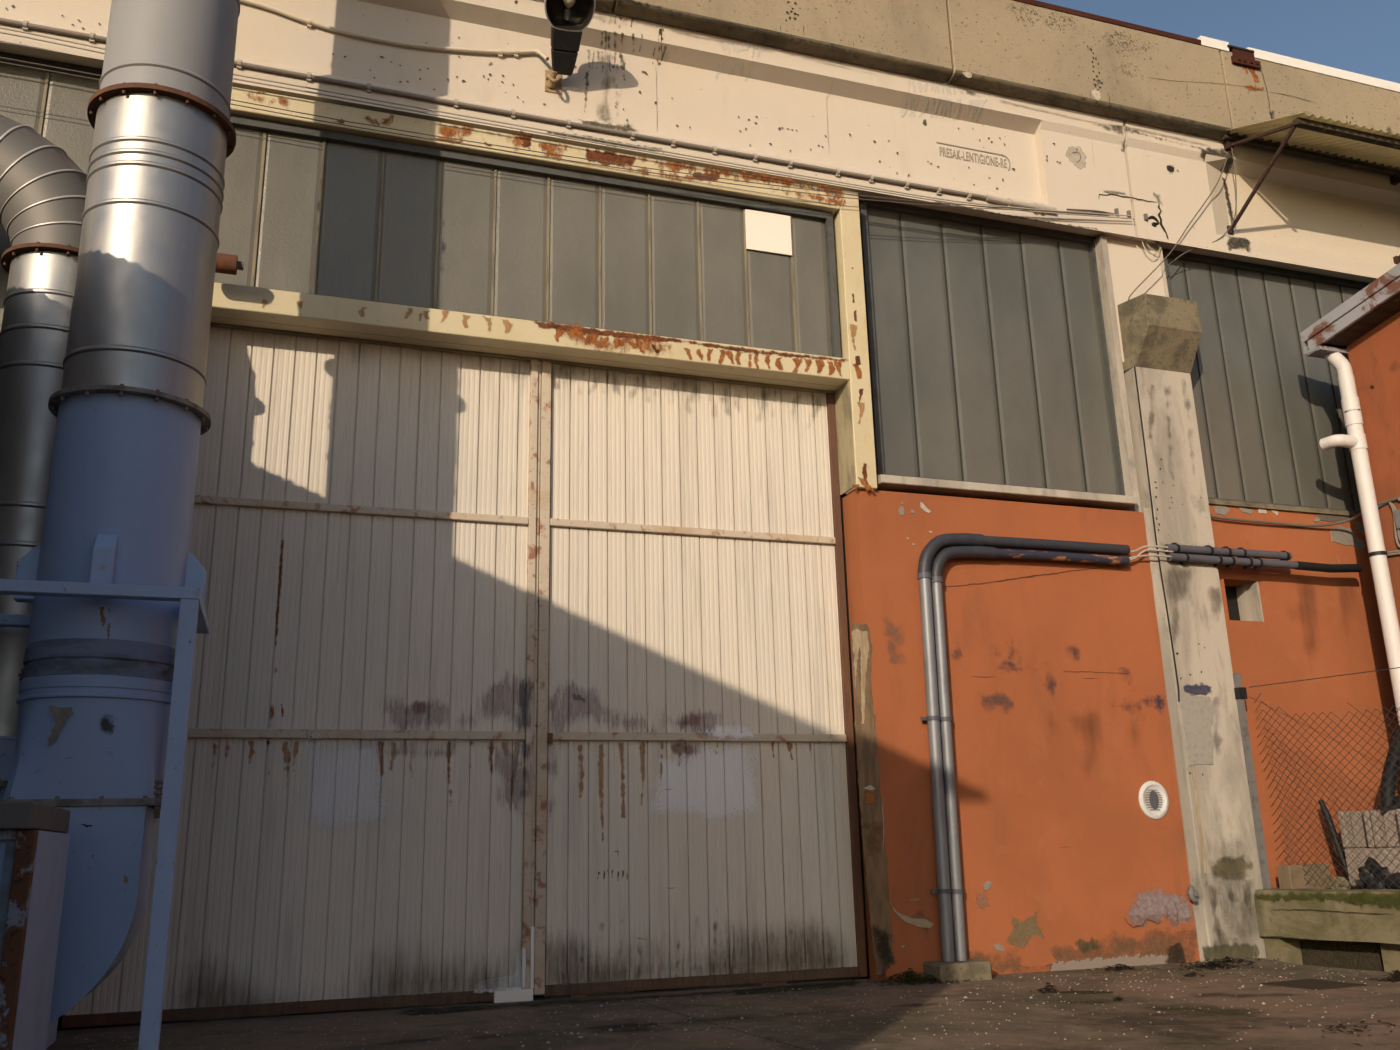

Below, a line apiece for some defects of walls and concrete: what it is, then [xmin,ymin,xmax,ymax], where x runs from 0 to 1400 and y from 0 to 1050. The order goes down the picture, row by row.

corrosion [433,122,845,206]
corrosion [405,308,512,333]
corrosion [535,294,864,424]
corrosion [852,463,874,492]
corrosion [248,741,299,774]
corrosion [378,742,396,776]
corrosion [470,742,519,794]
corrosion [578,743,680,840]
flaking render [851,624,905,976]
peeling [1124,886,1196,929]
spalling [993,913,1043,951]